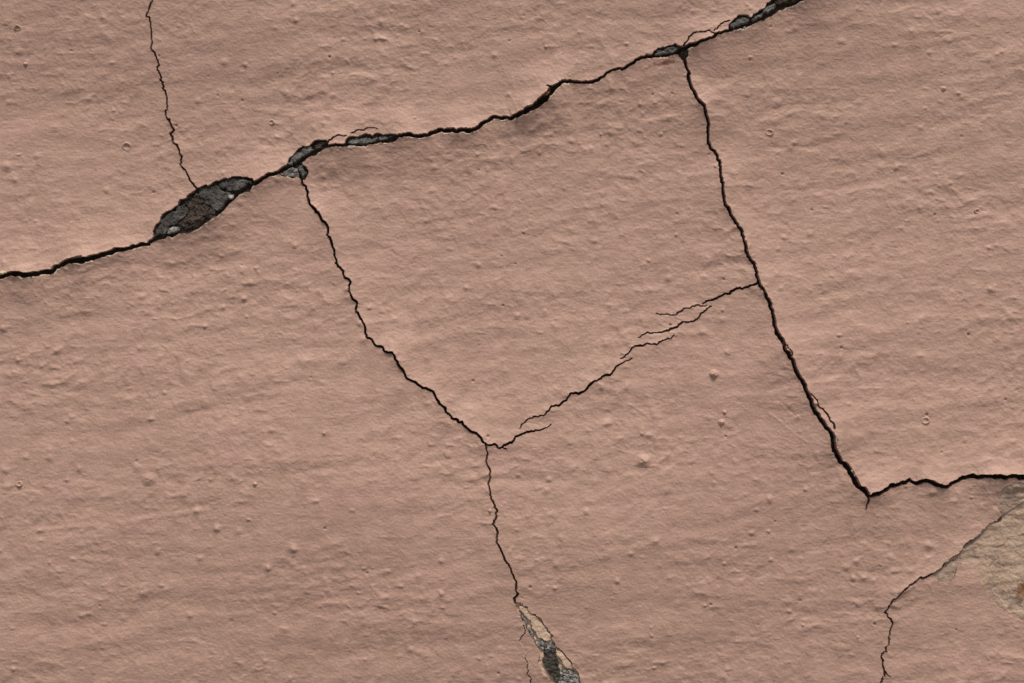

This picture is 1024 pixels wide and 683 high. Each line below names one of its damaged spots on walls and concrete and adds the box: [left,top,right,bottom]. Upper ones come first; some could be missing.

crack [146,0,198,190]
crack [0,219,209,279]
spalling [154,177,257,238]
crack [215,0,1024,604]
spalling [515,602,581,683]
crack [880,517,1002,683]
peeling [933,482,1024,622]